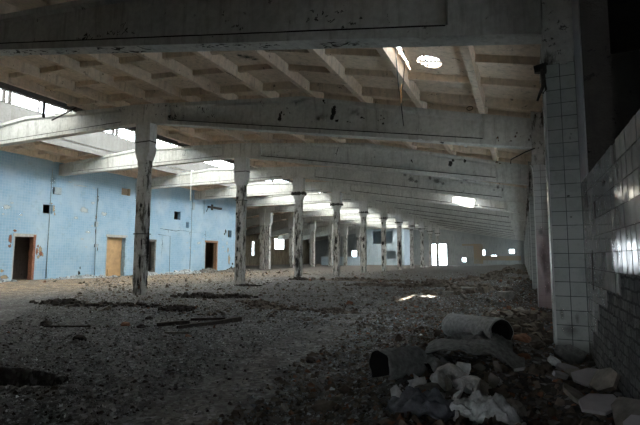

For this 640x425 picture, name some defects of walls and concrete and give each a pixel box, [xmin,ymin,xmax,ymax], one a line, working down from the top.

spalling [414,54,445,69]